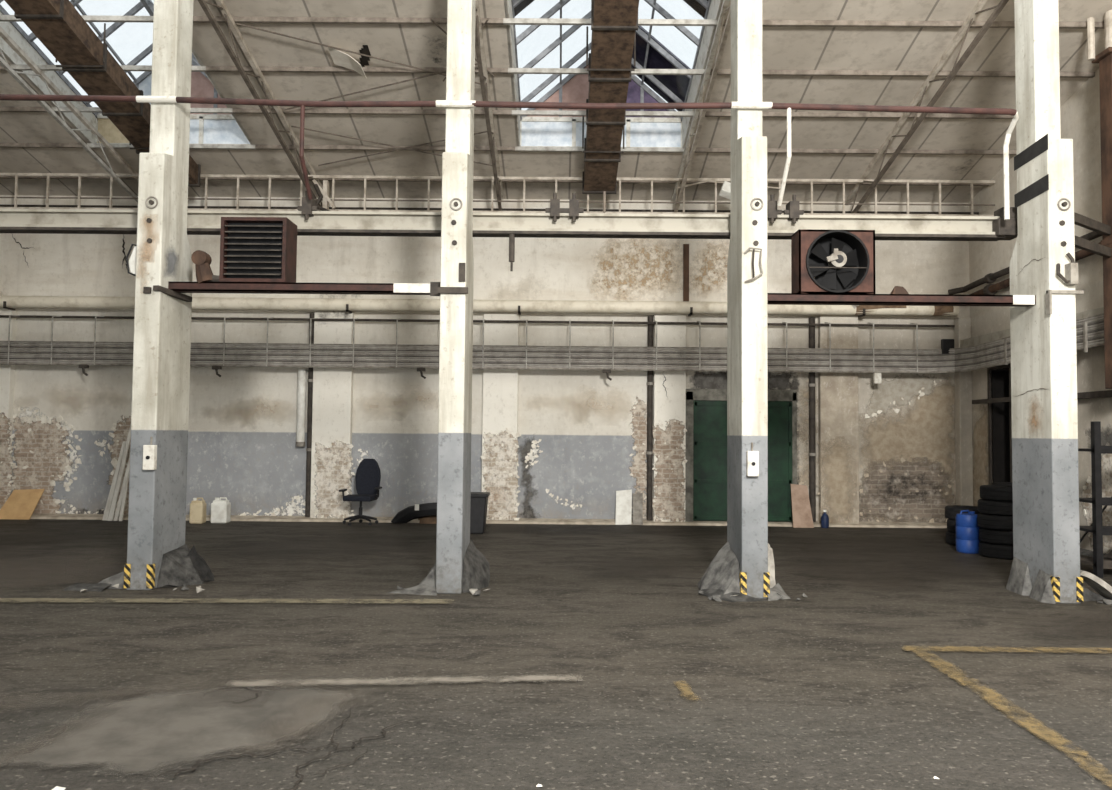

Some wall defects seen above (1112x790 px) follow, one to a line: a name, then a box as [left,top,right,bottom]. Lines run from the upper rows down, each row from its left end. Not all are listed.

peeling [596,239,728,300]
spalling [0,407,131,514]
spalling [238,440,368,519]
spalling [480,428,543,520]
spalling [629,397,687,522]
flaking render [859,373,955,523]
crack [143,702,436,790]